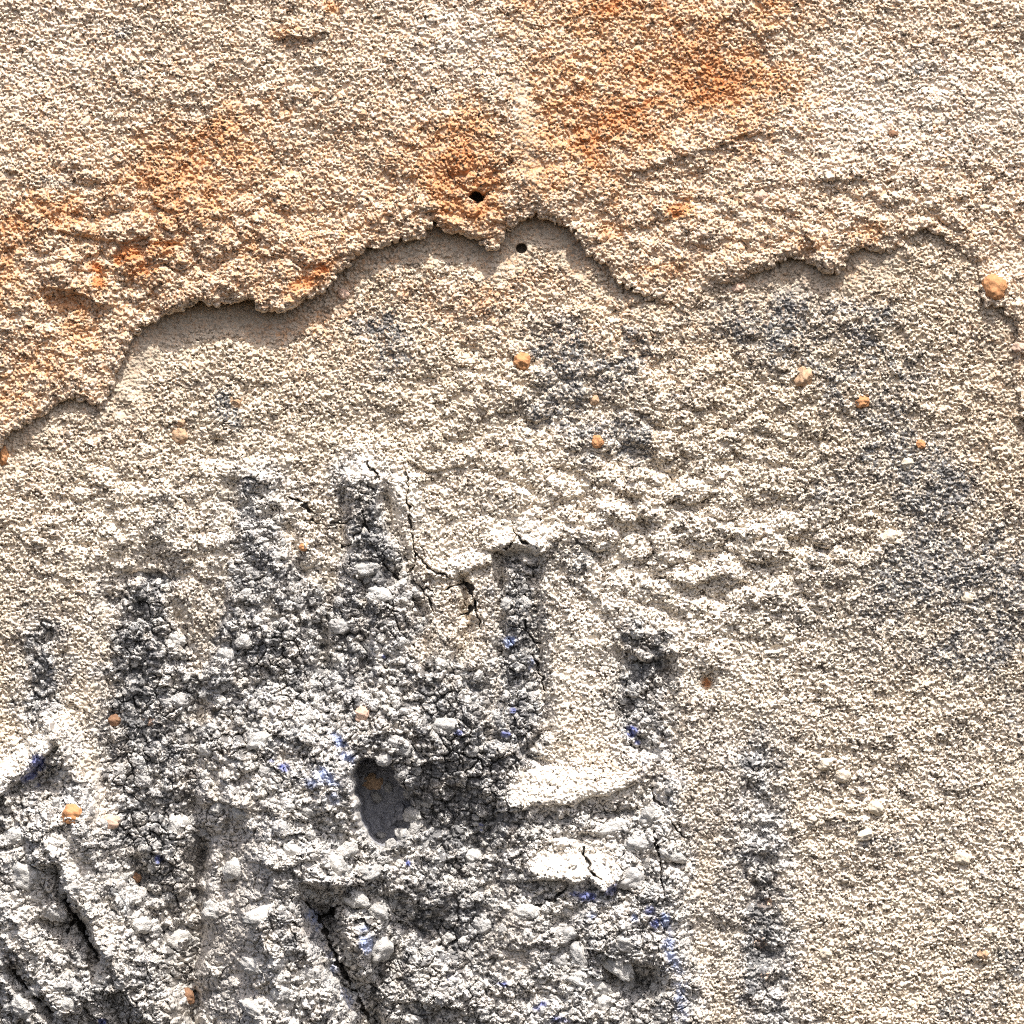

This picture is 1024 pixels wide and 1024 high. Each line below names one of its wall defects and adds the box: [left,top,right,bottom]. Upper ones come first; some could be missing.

corrosion [253,18,320,48]
corrosion [321,0,344,17]
corrosion [384,0,846,248]
corrosion [0,85,297,435]
corrosion [256,256,372,346]
corrosion [387,263,591,330]
flaking render [0,0,1024,452]
corrosion [629,253,696,284]
crack [288,497,370,548]
crack [383,471,481,629]
spalling [0,466,704,1024]